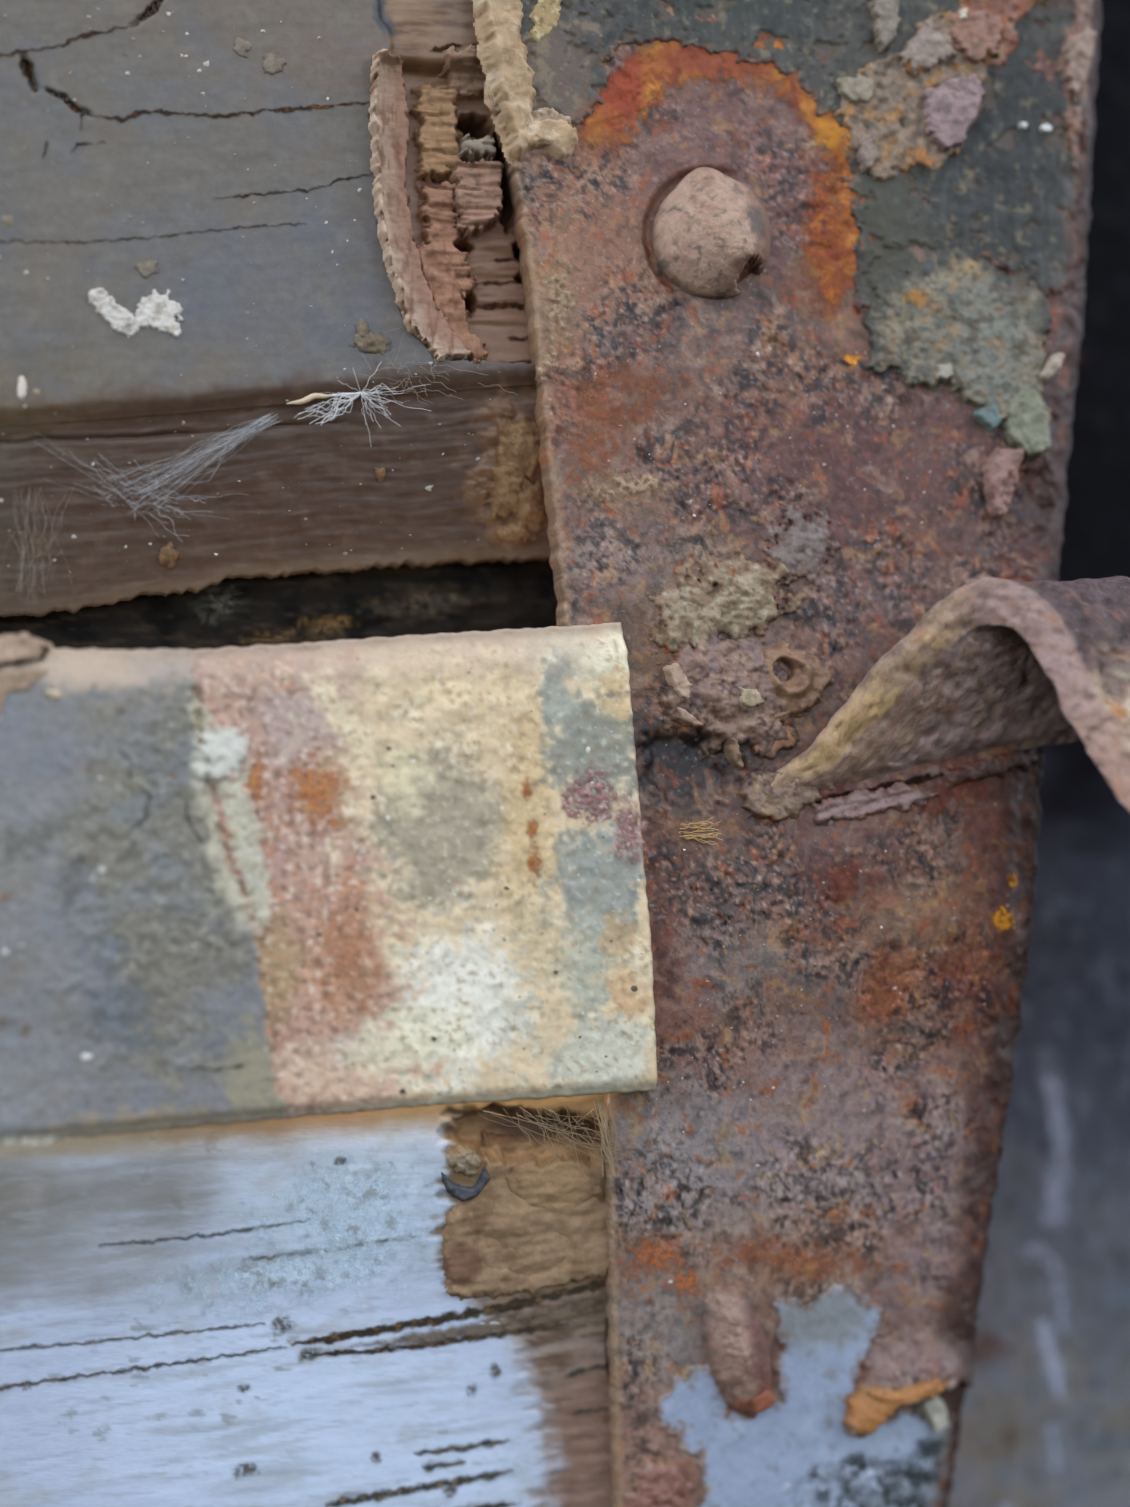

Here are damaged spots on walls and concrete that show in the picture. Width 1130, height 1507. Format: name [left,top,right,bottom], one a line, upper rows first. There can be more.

crack [0,0,366,155]
rust [1054,0,1096,172]
rust [580,0,1048,306]
peeling [471,0,1093,460]
rust [982,448,1024,520]
spalling [0,632,62,715]
rust [737,748,1044,827]
crack [113,1223,412,1260]
crack [0,1280,606,1390]
peeling [654,1281,961,1507]
rust [842,1315,979,1439]
crack [326,1440,515,1507]